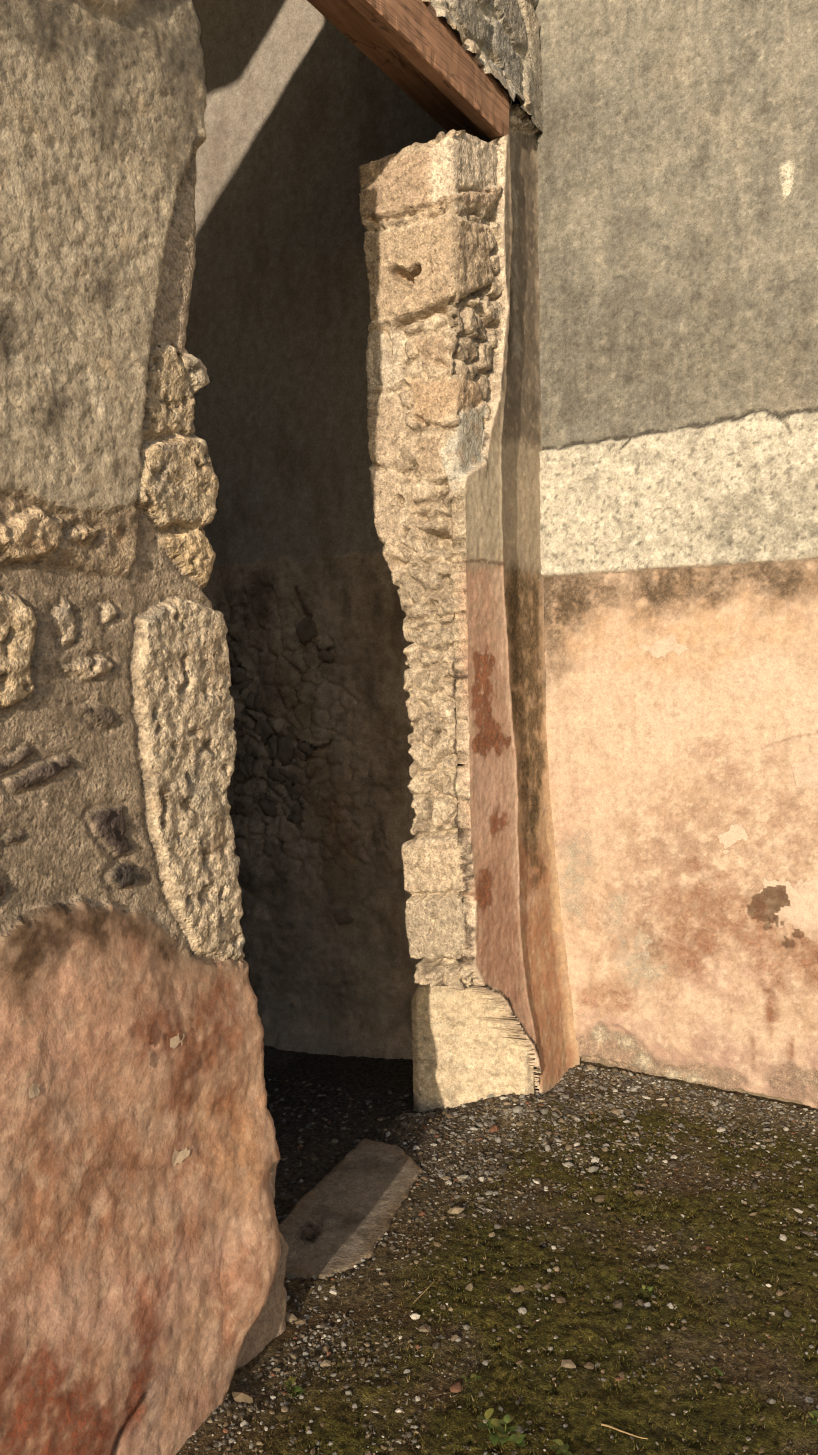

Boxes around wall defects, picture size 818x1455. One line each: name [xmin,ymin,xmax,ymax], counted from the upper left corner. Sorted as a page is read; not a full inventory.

damp [641,569,716,604]
flaking render [639,634,689,658]
damp [509,570,617,879]
flaking render [718,821,748,854]
flaking render [760,875,818,944]
spalling [576,1024,746,1090]
spalling [767,1064,818,1102]